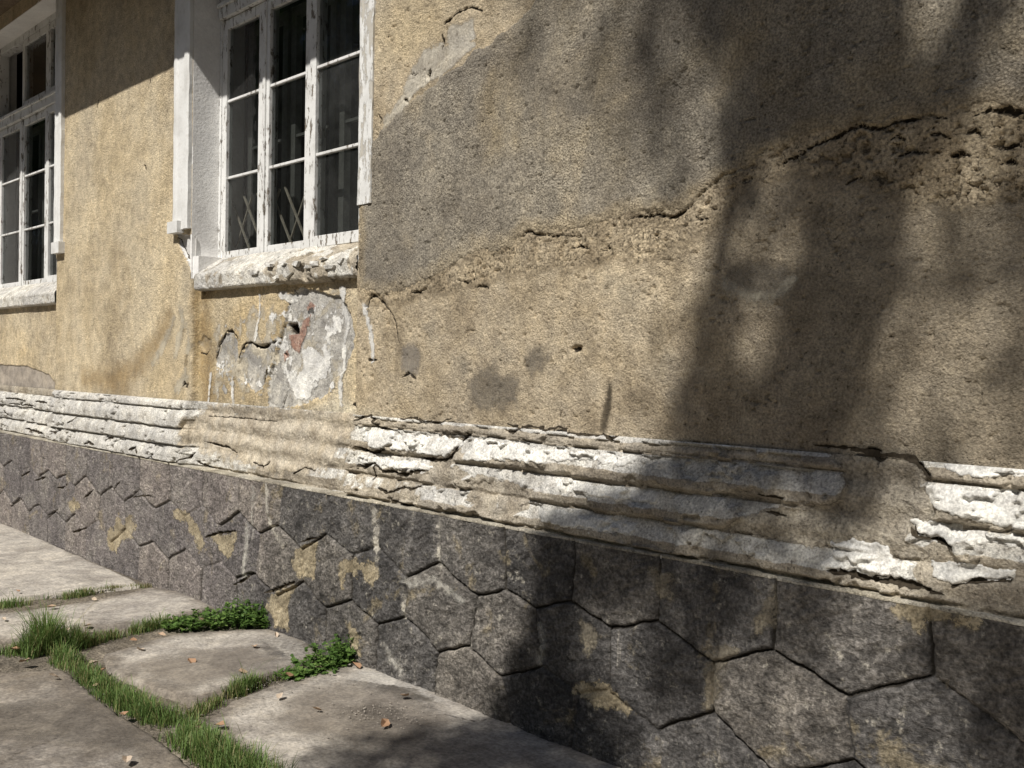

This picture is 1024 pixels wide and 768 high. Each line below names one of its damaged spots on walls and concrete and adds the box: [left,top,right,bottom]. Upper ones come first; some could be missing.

flaking render [177,234,196,273]
peeling [250,257,344,280]
crack [367,294,400,343]
flaking render [201,287,355,408]
peeling [357,428,636,471]
peeling [538,508,639,535]
peeling [554,478,661,504]
peeling [910,461,1024,548]
peeling [820,538,896,579]
peeling [931,560,1016,584]